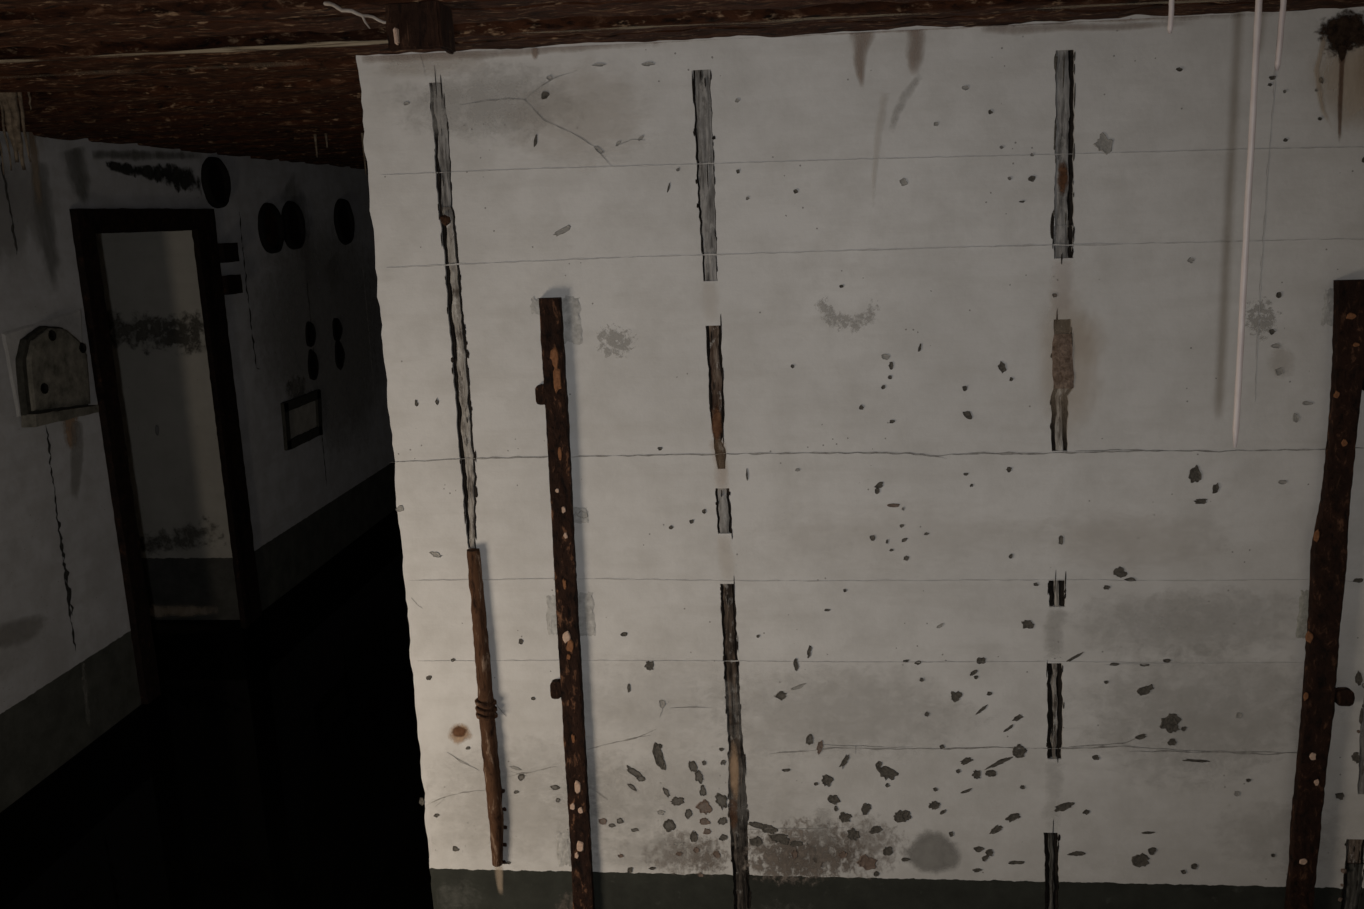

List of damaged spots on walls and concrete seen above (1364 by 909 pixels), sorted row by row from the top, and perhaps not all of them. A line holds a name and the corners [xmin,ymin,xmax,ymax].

mould [1318,9,1364,61]
spalling [1050,210,1075,264]
spalling [451,325,477,464]
rust [550,347,561,393]
spalling [870,482,909,561]
rust [562,631,574,660]
rust [451,725,469,742]
spalling [1135,713,1187,746]
rust [570,781,583,813]
spalling [1047,802,1090,856]